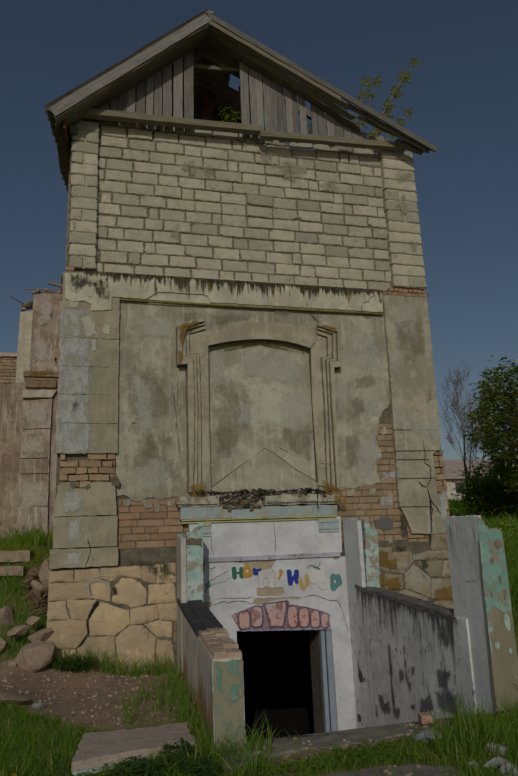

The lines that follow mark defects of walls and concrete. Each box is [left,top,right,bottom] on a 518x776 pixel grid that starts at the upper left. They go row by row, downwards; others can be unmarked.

peeling [20,279,111,540]
crack [419,442,441,546]
peeling [478,518,512,654]
crack [77,601,99,648]
leakage [357,589,458,659]
leakage [376,645,414,718]
leakage [412,669,457,717]